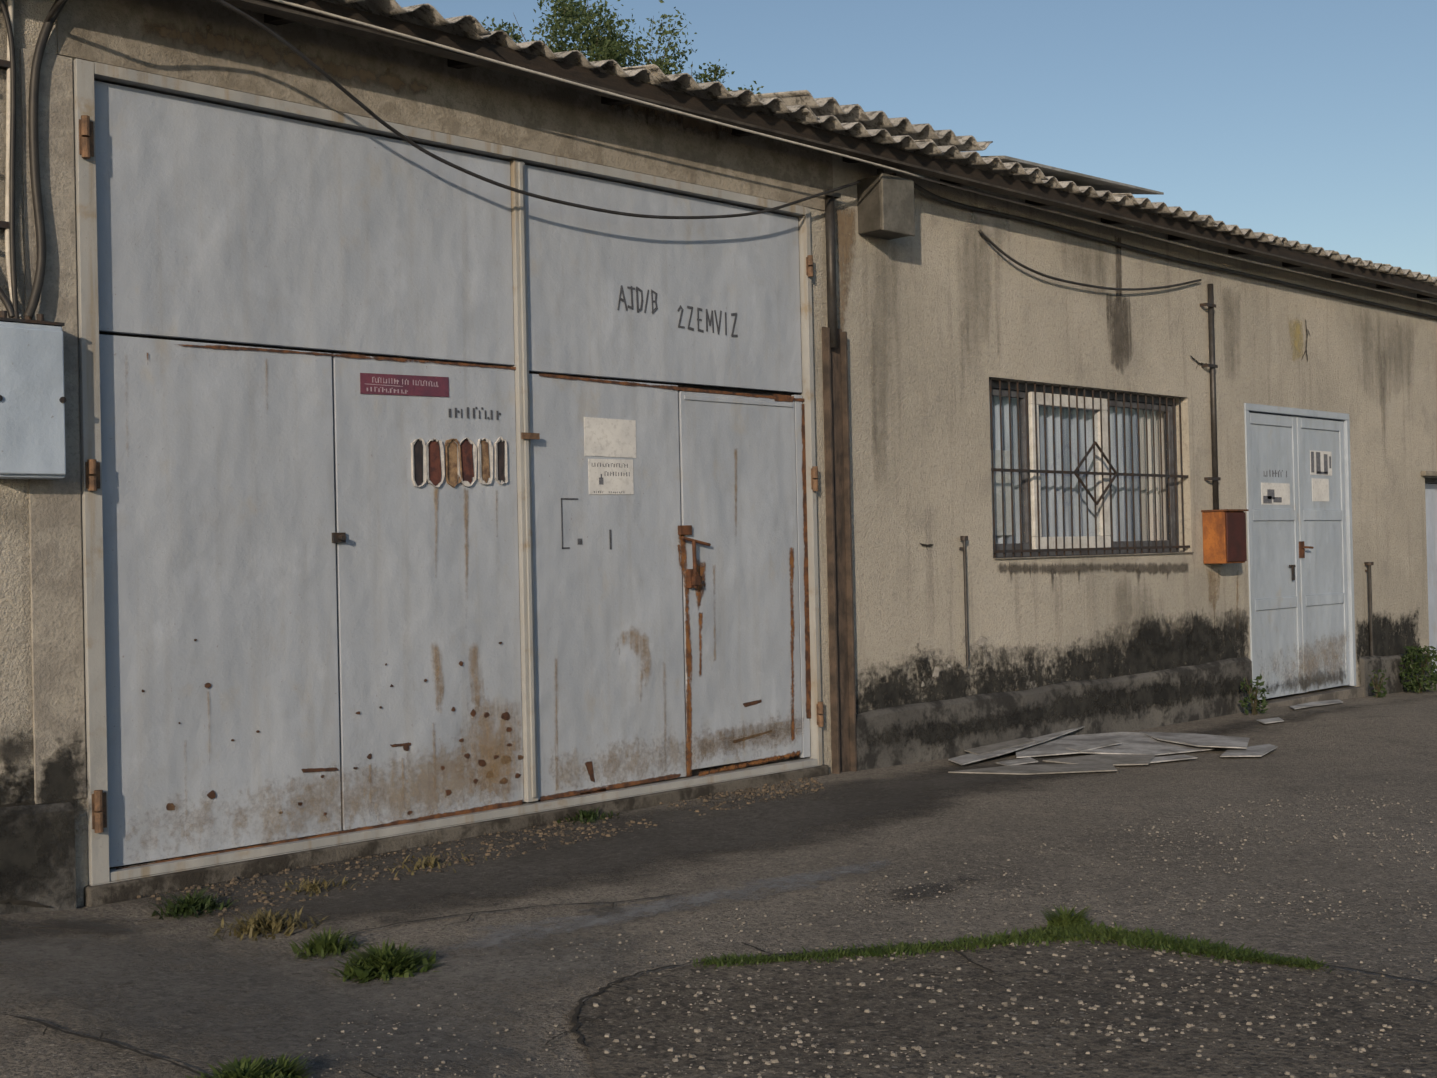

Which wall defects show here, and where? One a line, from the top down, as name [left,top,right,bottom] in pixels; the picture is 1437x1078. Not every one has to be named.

leakage [1106,238,1131,369]
rust [539,374,811,802]
leakage [0,739,131,939]
rust [116,790,523,870]
rust [302,754,372,778]
rust [451,648,524,784]
mould [856,611,1420,748]